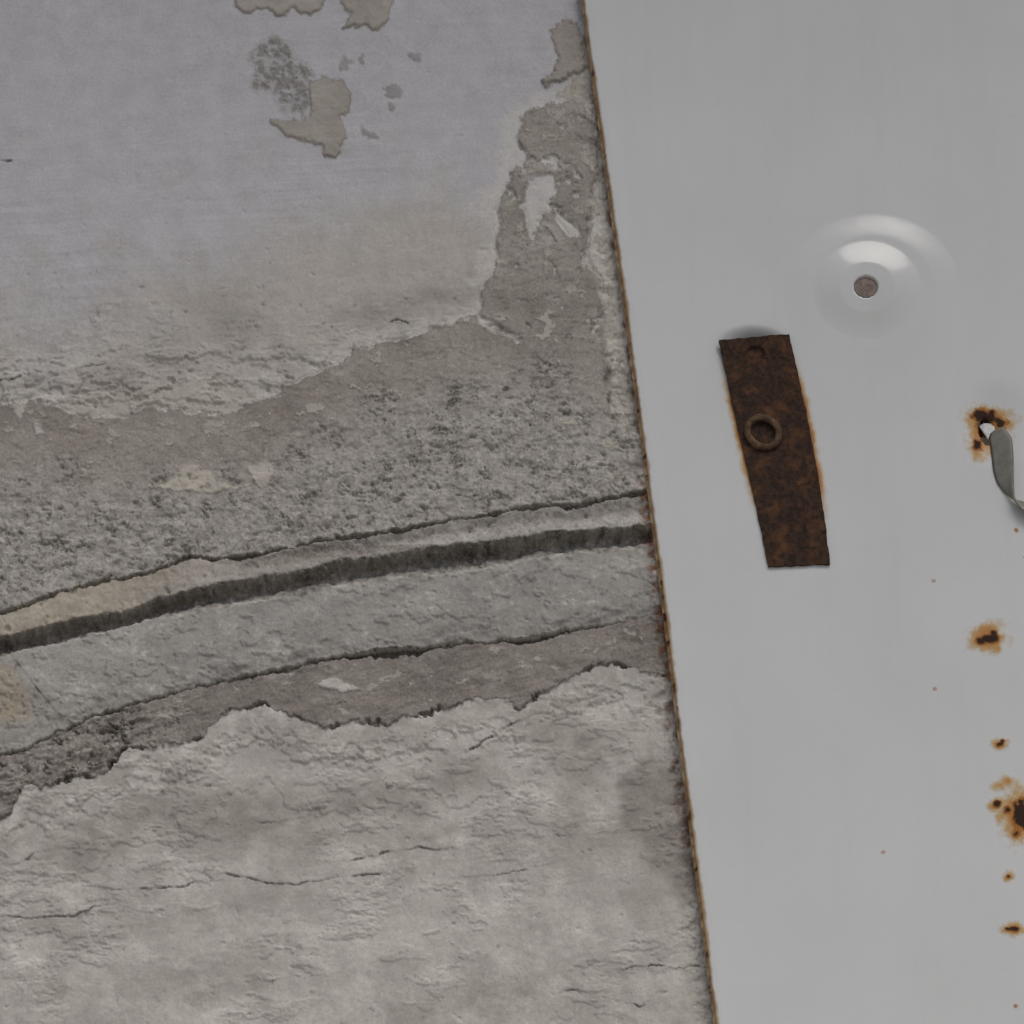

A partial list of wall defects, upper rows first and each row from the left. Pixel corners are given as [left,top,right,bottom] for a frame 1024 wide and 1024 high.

peeling [235,0,325,16]
peeling [341,0,394,31]
spalling [0,20,647,615]
rust [728,388,751,487]
rust [799,378,823,497]
rust [967,407,1013,460]
crack [491,503,594,518]
rust [971,624,1004,652]
spalling [0,614,673,832]
rust [988,777,1024,841]
rust [1002,923,1024,935]